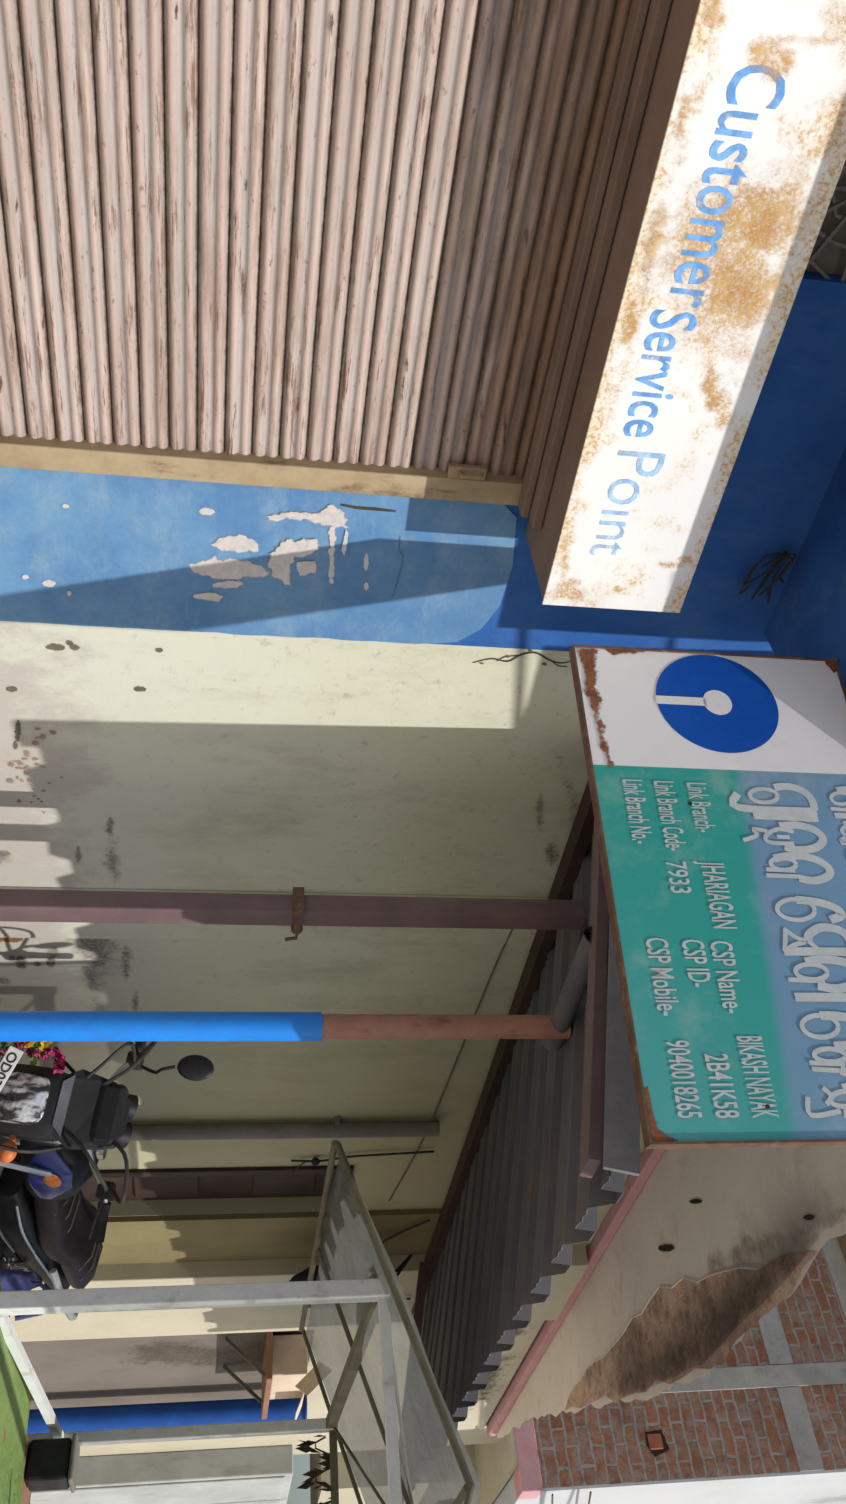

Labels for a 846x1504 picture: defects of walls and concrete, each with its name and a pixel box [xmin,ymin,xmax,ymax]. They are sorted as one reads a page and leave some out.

peeling [188,504,349,602]
crack [473,650,570,667]
flaking render [565,1252,818,1410]